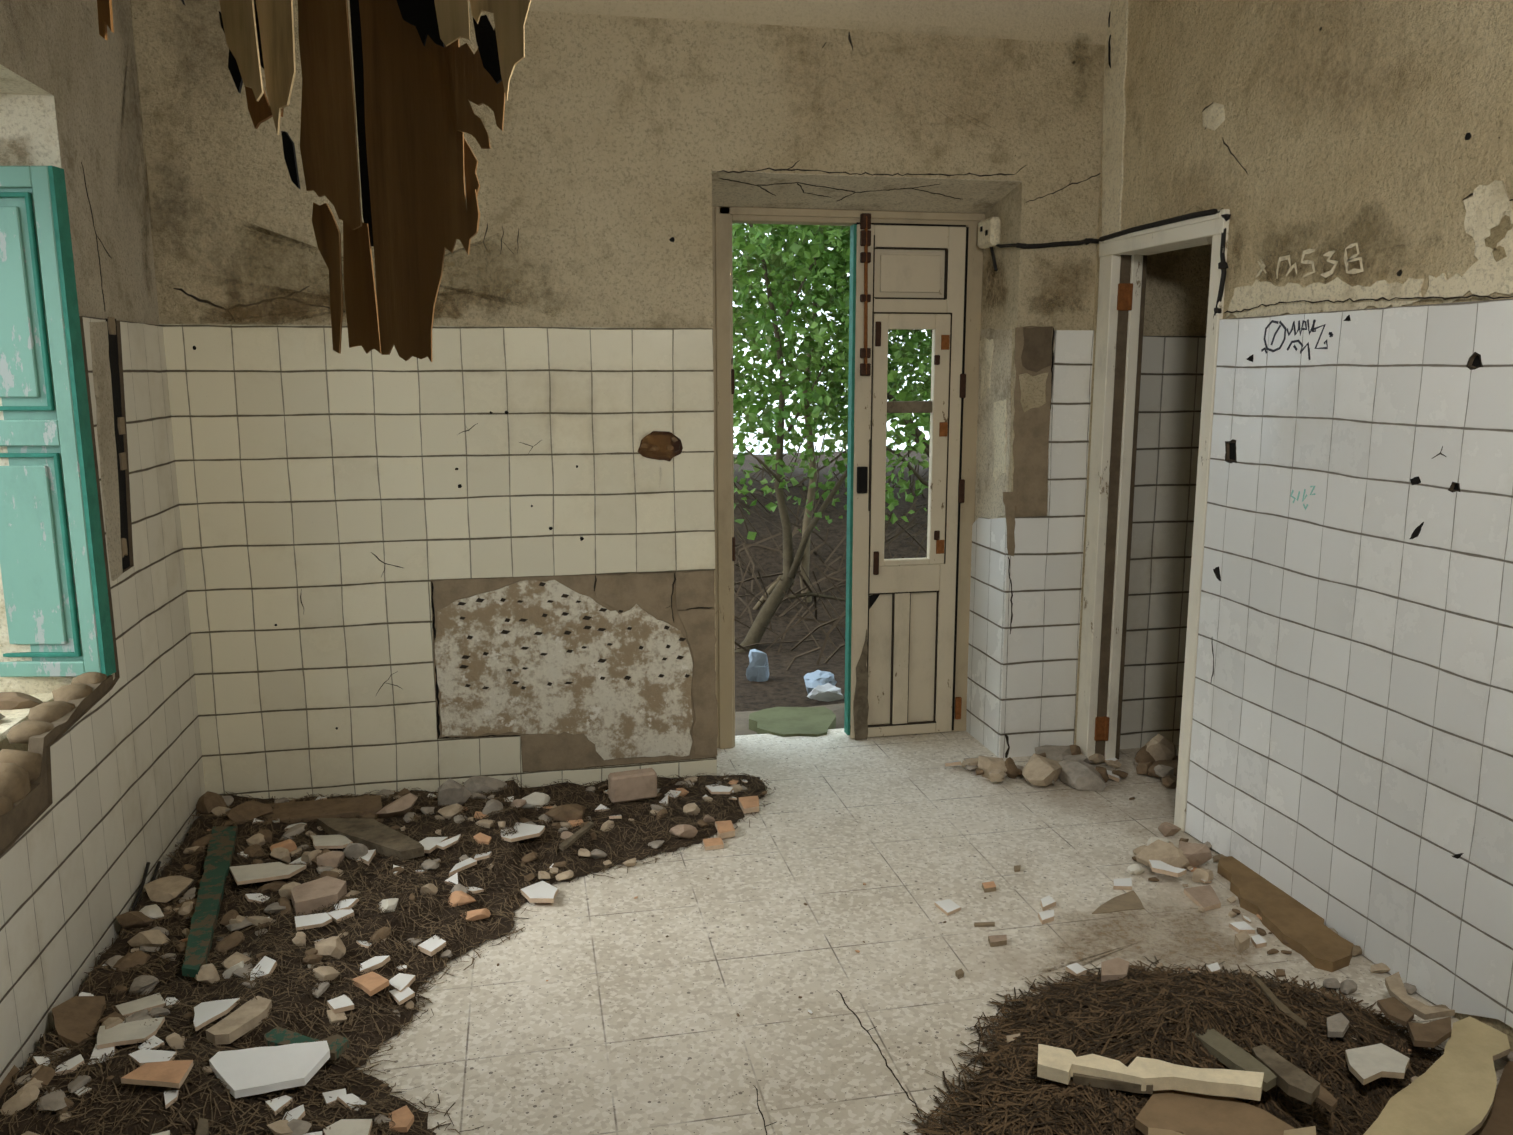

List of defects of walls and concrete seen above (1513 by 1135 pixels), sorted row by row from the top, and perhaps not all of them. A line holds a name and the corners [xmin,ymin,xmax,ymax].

water stain [225,227,346,319]
water stain [435,242,532,316]
peeling [1224,180,1513,321]
spalling [640,433,680,457]
spalling [975,326,1055,556]
spalling [431,570,718,772]